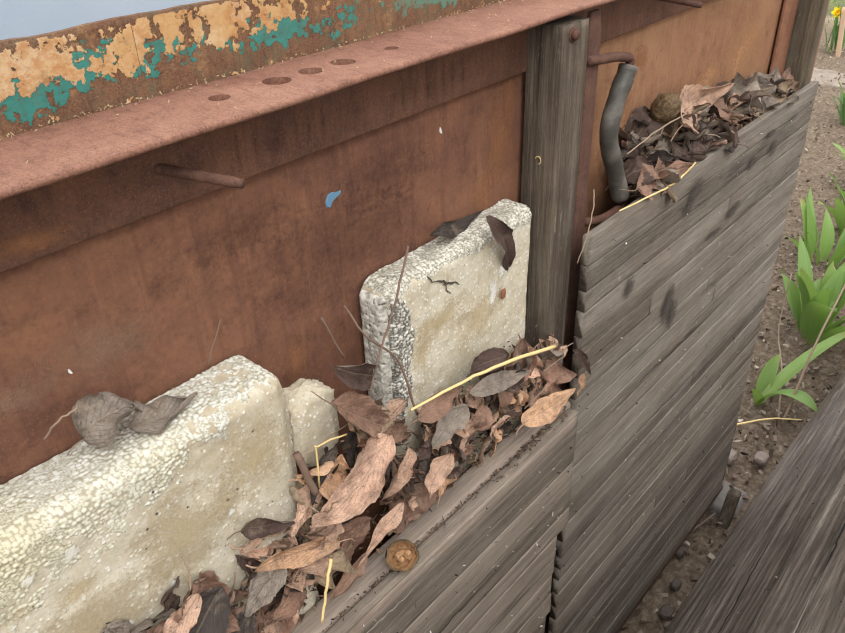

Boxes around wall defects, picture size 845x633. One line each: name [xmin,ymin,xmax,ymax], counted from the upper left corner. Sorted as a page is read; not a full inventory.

peeling [0,0,457,126]